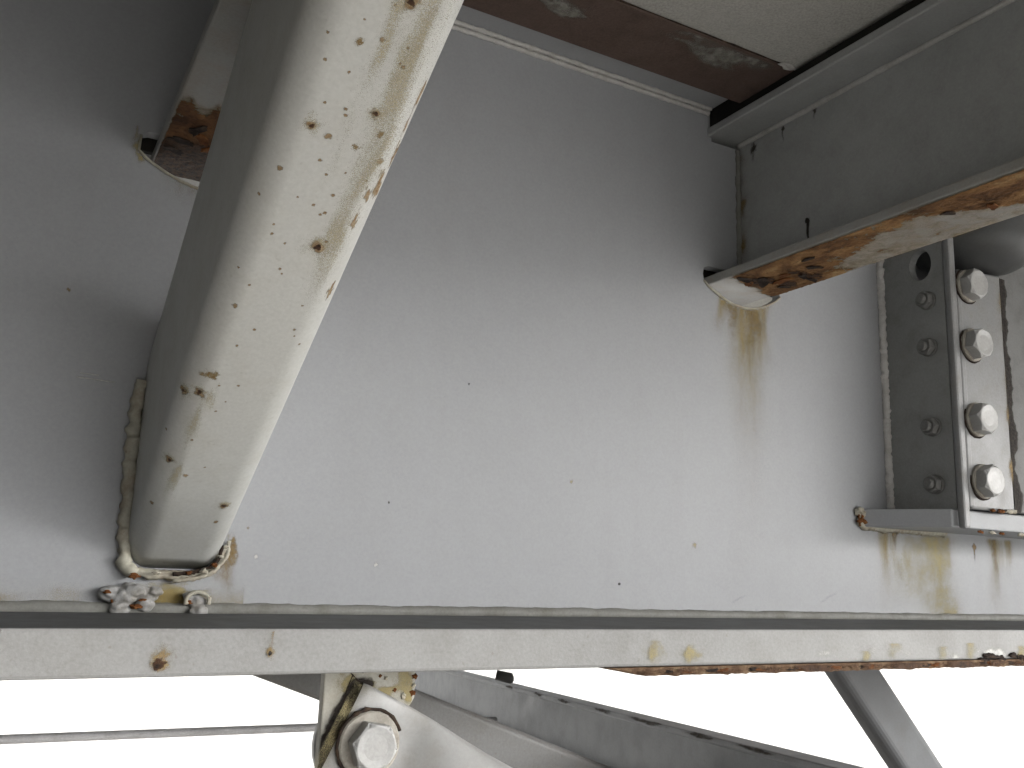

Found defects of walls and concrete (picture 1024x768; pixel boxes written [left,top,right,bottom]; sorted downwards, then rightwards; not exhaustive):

corrosion [394,0,428,14]
corrosion [301,101,332,139]
corrosion [155,98,221,182]
corrosion [364,82,426,202]
corrosion [300,235,336,258]
corrosion [732,169,1024,296]
corrosion [180,370,226,412]
corrosion [970,475,1017,514]
corrosion [972,530,1024,610]
corrosion [129,584,193,609]
corrosion [149,645,172,672]
corrosion [644,640,1024,676]